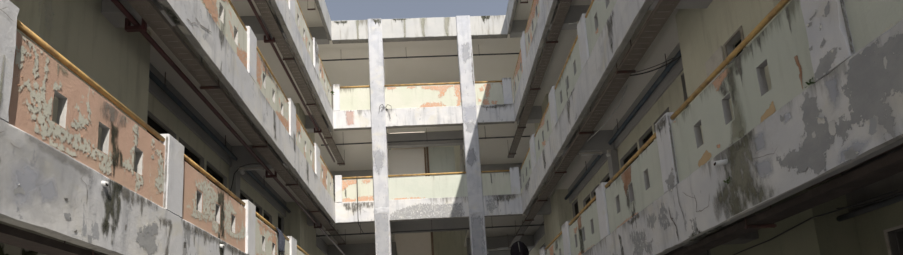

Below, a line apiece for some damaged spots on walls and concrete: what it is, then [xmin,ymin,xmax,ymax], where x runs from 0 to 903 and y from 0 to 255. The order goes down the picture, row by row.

peeling [15,36,164,194]
peeling [408,85,461,107]
flaking render [776,34,903,174]
flaking render [616,203,670,255]
crack [669,191,707,241]